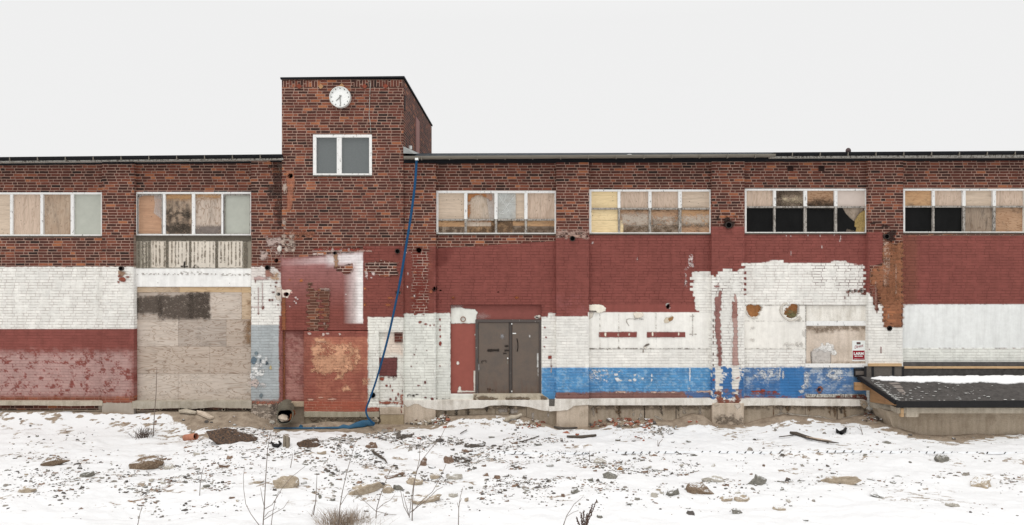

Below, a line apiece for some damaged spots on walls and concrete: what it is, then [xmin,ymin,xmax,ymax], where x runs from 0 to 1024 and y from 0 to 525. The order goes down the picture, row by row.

peeling [312,248,398,290]
peeling [870,283,888,312]
peeling [254,279,361,401]
peeling [714,284,757,379]
peeling [688,368,784,403]